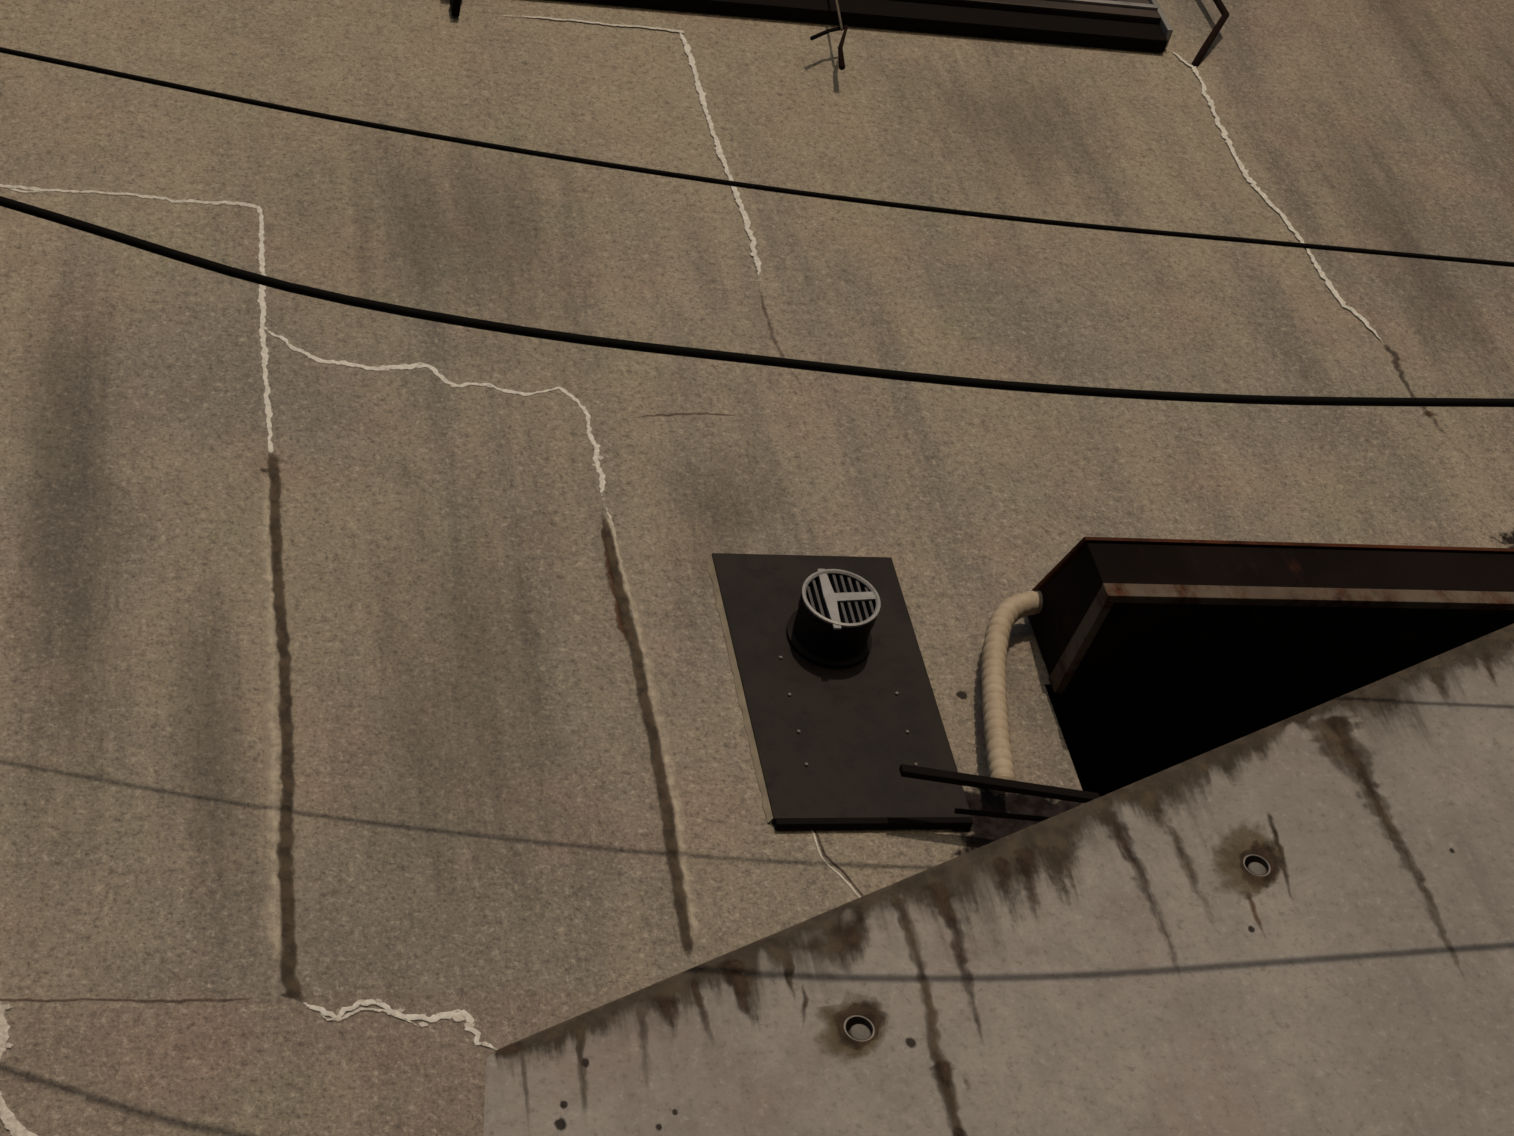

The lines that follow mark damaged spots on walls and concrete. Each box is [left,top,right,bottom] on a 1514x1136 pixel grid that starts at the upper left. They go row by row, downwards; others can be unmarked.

crack [0,184,631,597]
crack [488,14,776,342]
crack [648,410,725,418]
crack [1173,52,1438,425]
crack [0,996,240,1004]
crack [304,999,498,1050]
water stain [504,723,1277,1136]
water stain [1215,815,1288,924]
water stain [1304,624,1512,951]